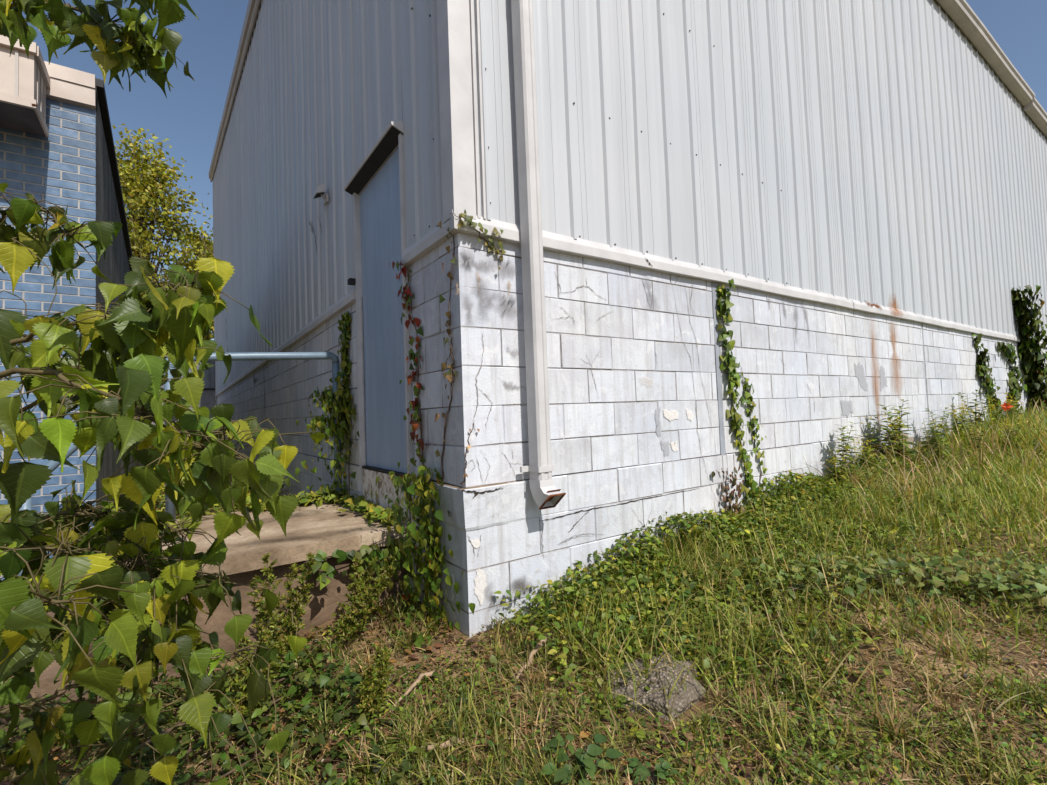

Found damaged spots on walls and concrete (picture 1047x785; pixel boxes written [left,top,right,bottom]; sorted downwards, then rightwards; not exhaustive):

leakage [464,257,512,317]
crack [554,273,608,322]
crack [473,334,492,429]
peeling [655,407,693,457]
crack [539,488,699,556]
peeling [474,569,487,605]